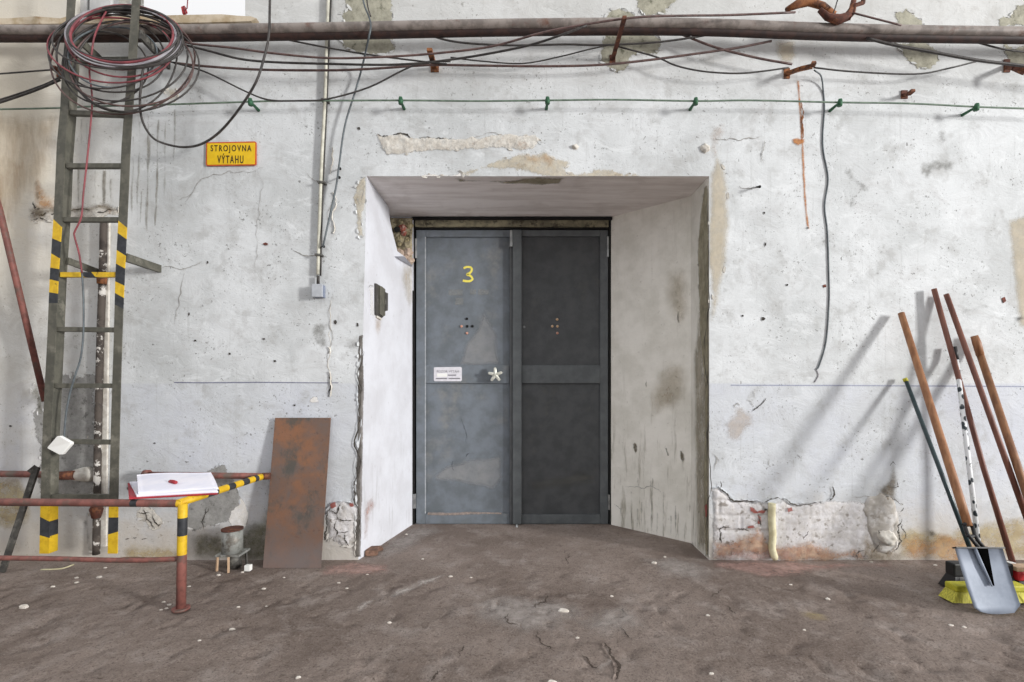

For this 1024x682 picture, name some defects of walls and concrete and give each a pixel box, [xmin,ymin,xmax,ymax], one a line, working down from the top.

peeling [338,0,394,22]
peeling [999,5,1024,26]
peeling [339,39,395,56]
peeling [599,36,662,73]
peeling [1003,44,1024,64]
spalling [377,132,636,185]
crack [178,168,263,271]
flaking render [697,164,873,561]
crack [326,301,364,556]
spalling [324,322,383,557]